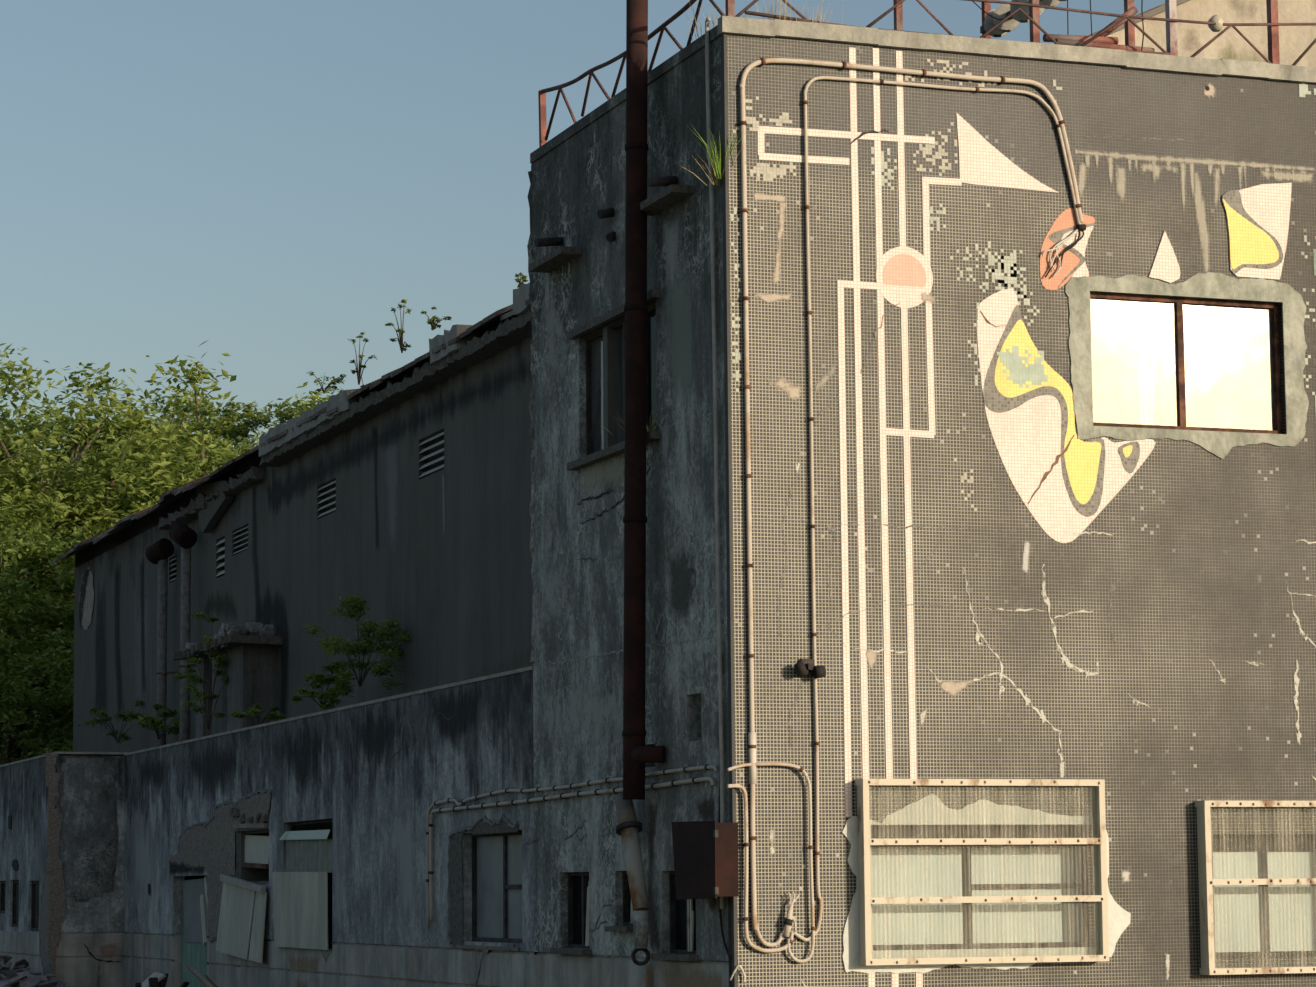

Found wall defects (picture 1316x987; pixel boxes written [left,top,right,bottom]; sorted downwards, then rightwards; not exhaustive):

peeling [1299,83,1316,97]
peeling [1303,235,1316,322]
water stain [253,366,530,612]
water stain [584,457,624,487]
crack [744,395,1120,762]
crack [1209,659,1264,684]
crack [1286,581,1316,744]
flaking render [170,789,273,942]